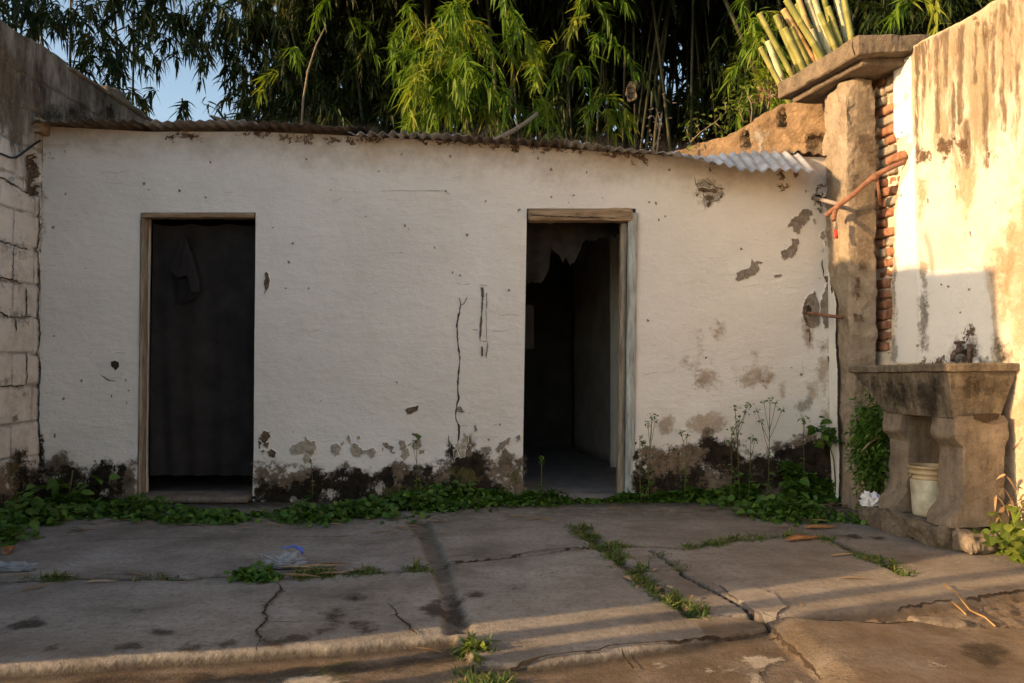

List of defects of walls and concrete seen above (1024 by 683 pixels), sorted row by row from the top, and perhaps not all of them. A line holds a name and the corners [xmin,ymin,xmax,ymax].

damp [914,0,1024,205]
spalling [22,153,41,197]
spalling [694,177,724,208]
peeling [780,190,827,261]
peeling [734,248,763,282]
damp [918,261,1008,364]
crack [448,298,467,461]
damp [0,431,139,509]
peeling [258,430,317,465]
peeling [330,433,425,461]
damp [250,436,527,502]
damp [631,398,859,502]